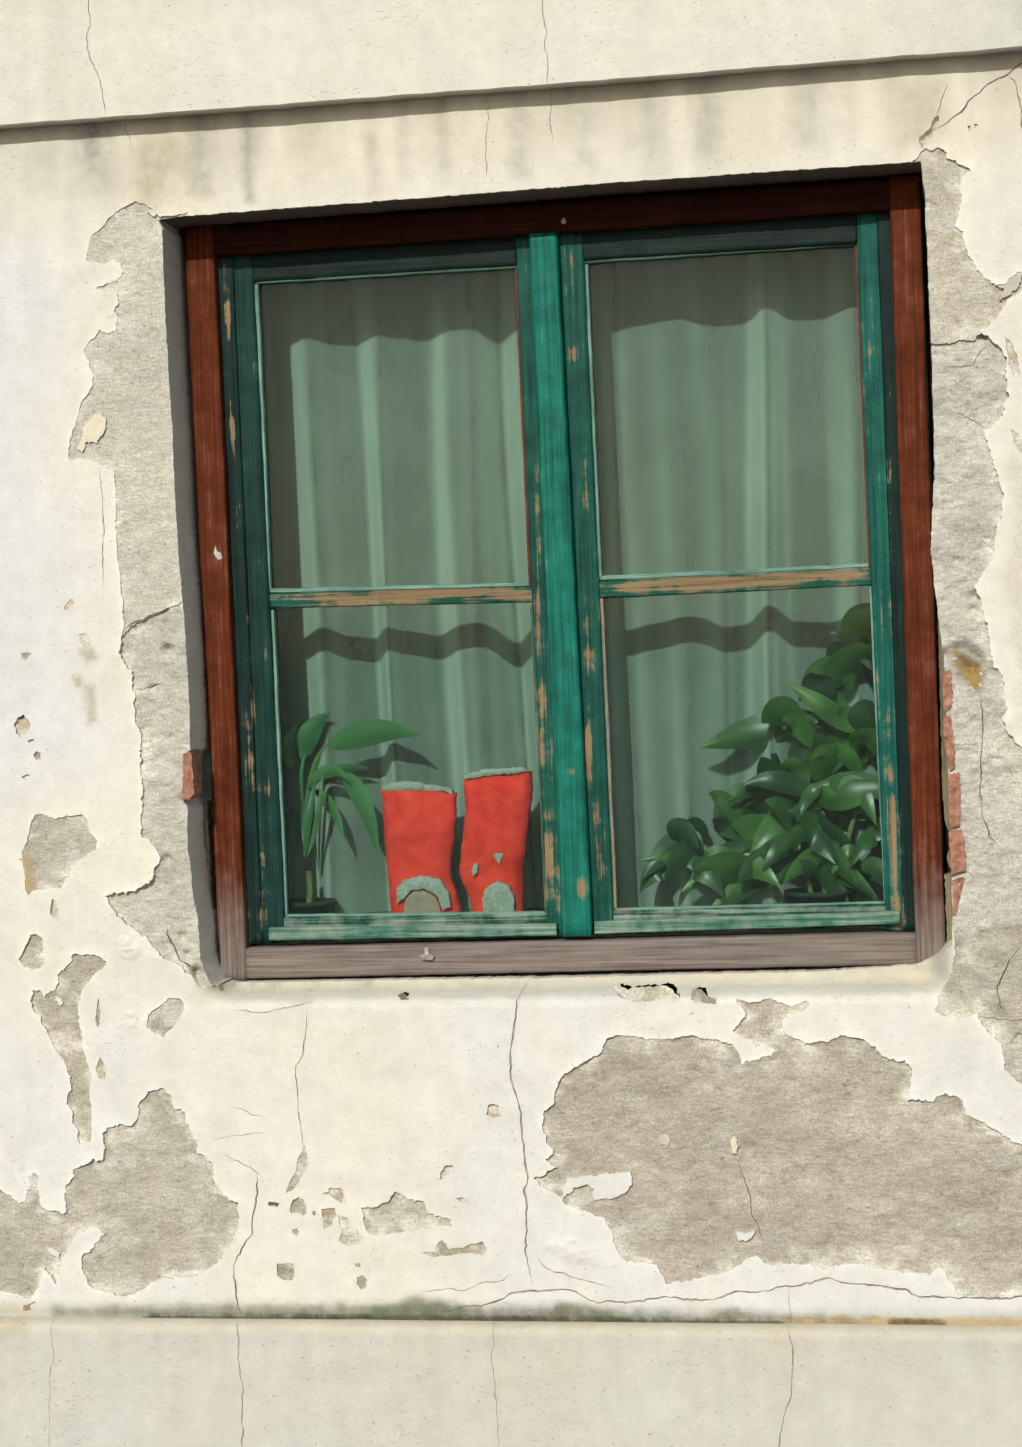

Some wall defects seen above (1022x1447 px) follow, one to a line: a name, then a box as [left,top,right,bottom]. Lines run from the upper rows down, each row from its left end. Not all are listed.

crack [936,62,1022,129]
peeling [69,202,219,988]
spalling [913,117,1022,1084]
spalling [19,934,45,969]
peeling [22,814,97,917]
spalling [0,954,240,1311]
crack [217,1108,263,1447]
crack [238,1002,312,1142]
spalling [269,1146,488,1257]
crack [427,983,1022,1447]
spalling [534,985,1022,1298]
crack [980,947,1022,1044]